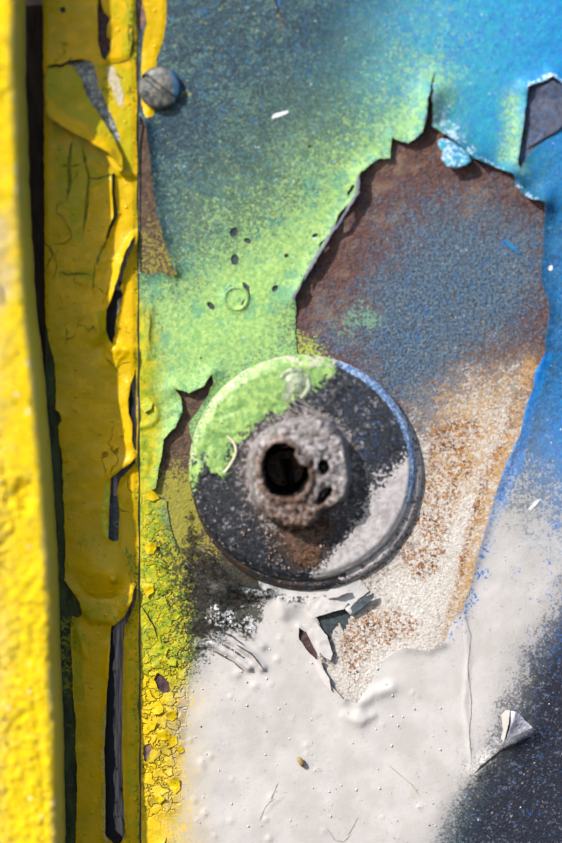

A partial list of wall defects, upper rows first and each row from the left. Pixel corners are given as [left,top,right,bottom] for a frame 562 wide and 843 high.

crack [46,57,82,68]
crack [53,142,114,245]
crack [61,240,107,289]
peeling [45,60,124,239]
crack [109,21,134,64]
peeling [518,76,562,168]
peeling [102,370,153,541]
peeling [145,374,261,590]
peeling [295,73,549,703]
rust [457,425,511,586]
peeling [100,581,154,843]
peeling [475,710,533,773]